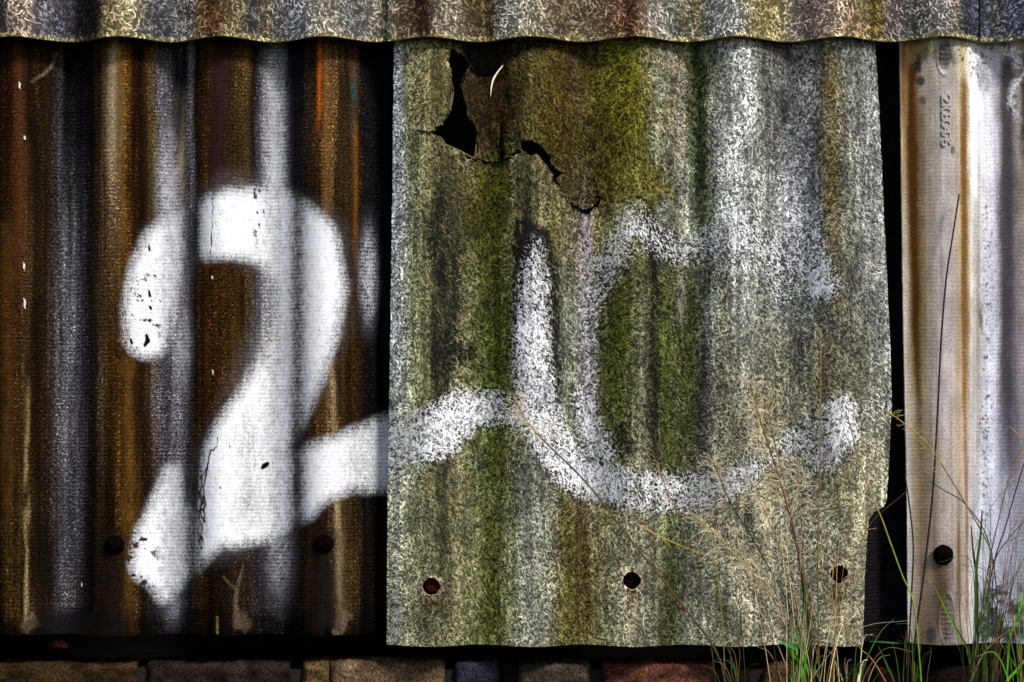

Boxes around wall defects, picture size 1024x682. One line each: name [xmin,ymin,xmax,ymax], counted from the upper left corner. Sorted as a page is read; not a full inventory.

rust [2,48,26,508]
rust [317,37,329,225]
water stain [391,65,401,382]
water stain [429,188,499,386]
spalling [431,40,547,163]
crack [474,127,522,164]
water stain [511,217,562,433]
water stain [613,421,637,462]
water stain [649,213,710,459]
rust [901,46,924,403]
rust [960,81,969,431]
rust [311,527,337,636]